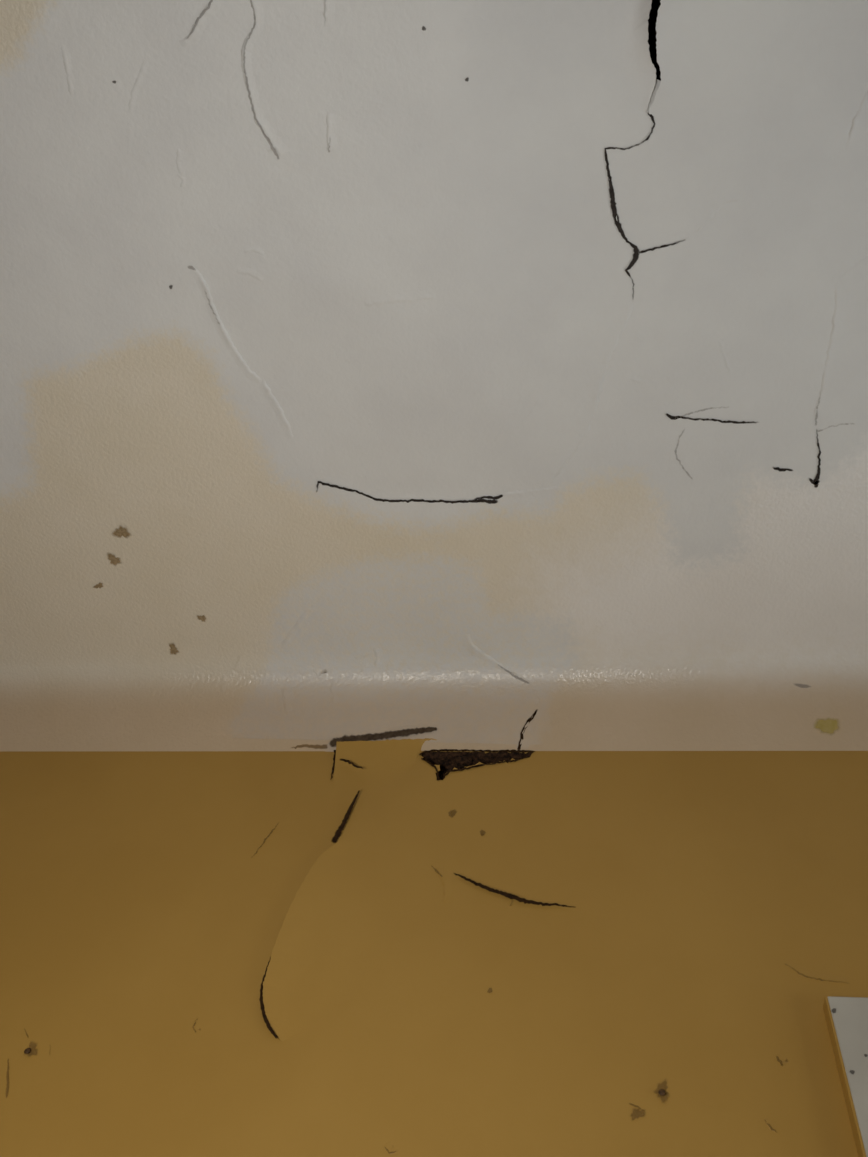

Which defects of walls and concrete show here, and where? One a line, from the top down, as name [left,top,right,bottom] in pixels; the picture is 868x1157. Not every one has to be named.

spalling [648,0,661,80]
crack [666,414,756,424]
crack [773,430,821,488]
crack [316,475,562,504]
peeling [259,708,544,1042]
crack [435,865,573,917]